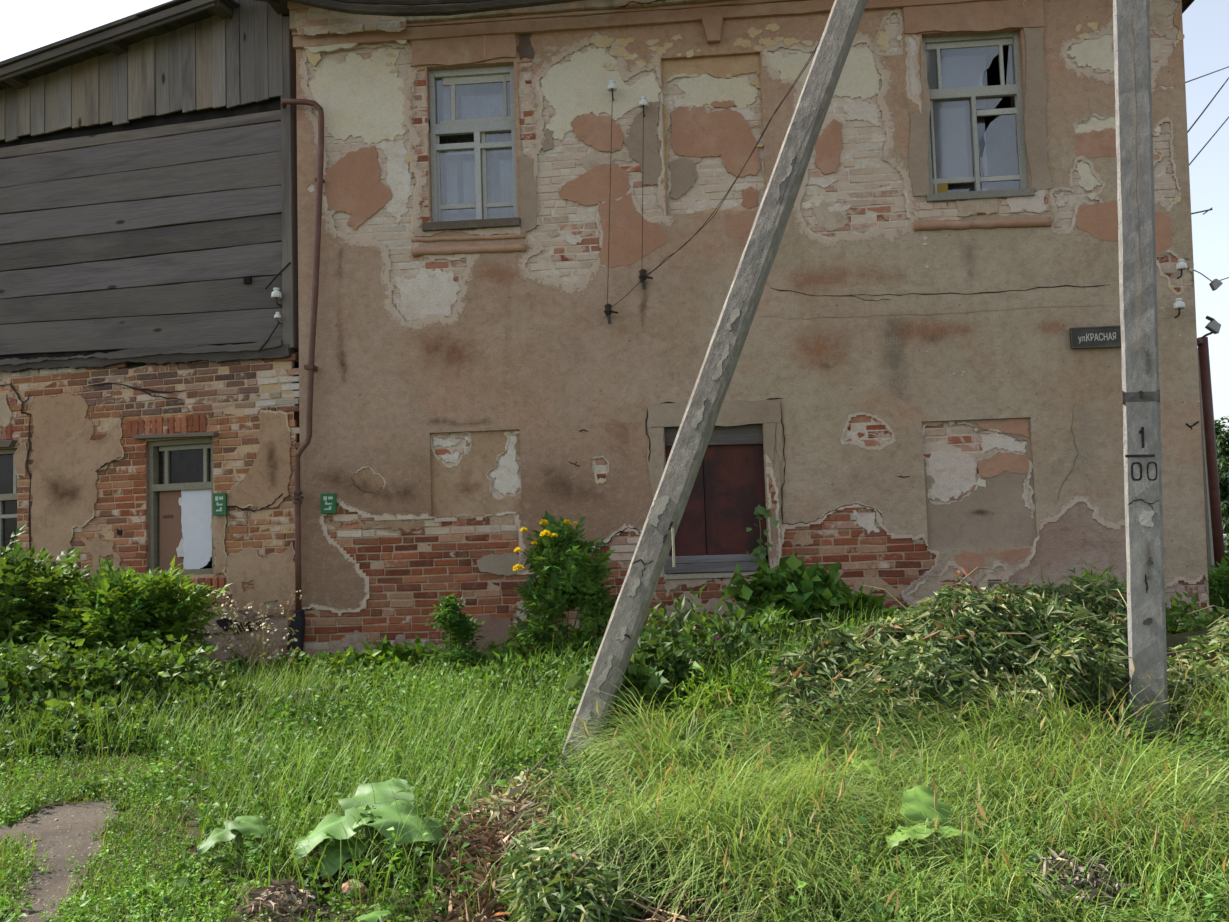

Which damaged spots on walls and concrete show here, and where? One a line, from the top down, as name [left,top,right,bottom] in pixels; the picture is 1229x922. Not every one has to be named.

flaking render [1058,12,1115,85]
flaking render [1149,0,1185,94]
flaking render [295,7,1106,333]
crack [735,72,1110,330]
flaking render [1073,114,1116,134]
flaking render [1153,116,1181,213]
crack [0,383,32,550]
flaking render [840,411,896,450]
flaking render [189,431,565,672]
flaking render [589,496,674,603]
flaking render [765,418,1154,623]
flaking render [642,568,760,646]